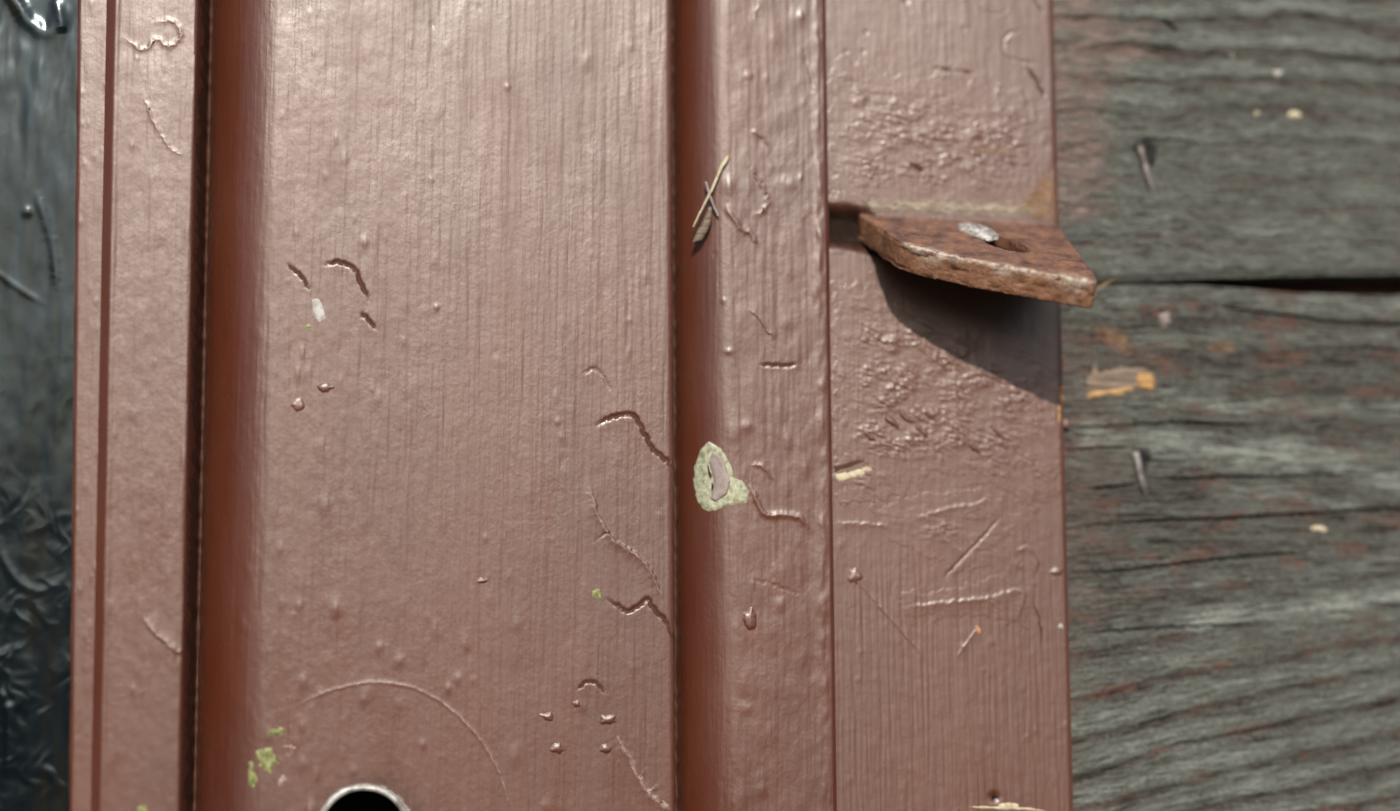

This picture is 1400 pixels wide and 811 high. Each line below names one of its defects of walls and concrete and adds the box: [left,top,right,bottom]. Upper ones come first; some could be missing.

crack [582,367,672,468]
peeling [693,442,750,511]